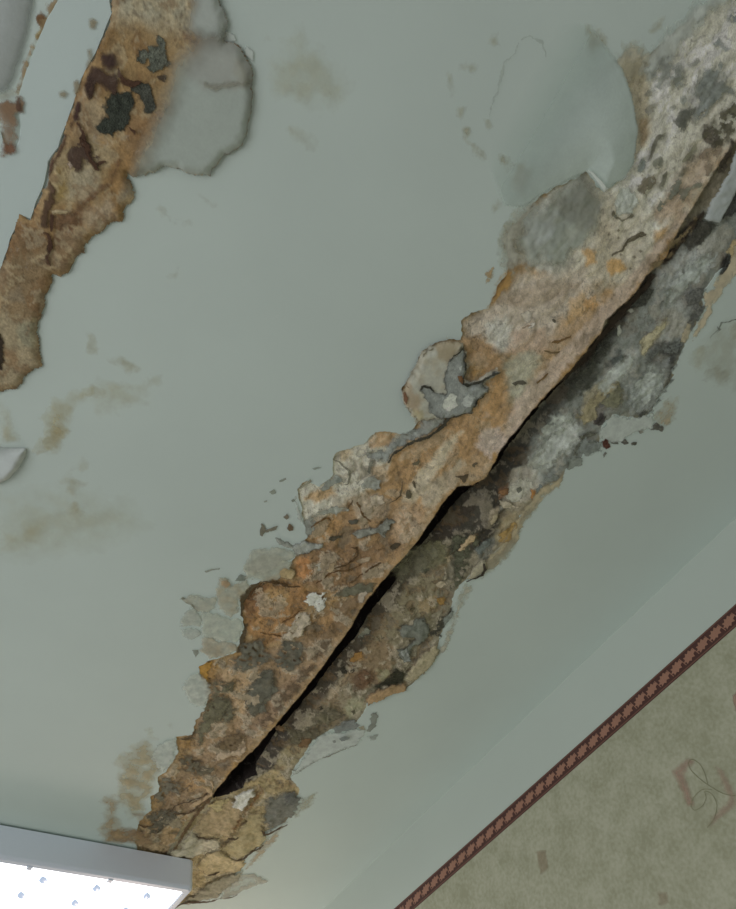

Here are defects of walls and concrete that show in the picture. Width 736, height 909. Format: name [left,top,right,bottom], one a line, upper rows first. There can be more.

flaking render [0,0,253,392]
flaking render [135,0,736,855]
crack [172,211,704,851]